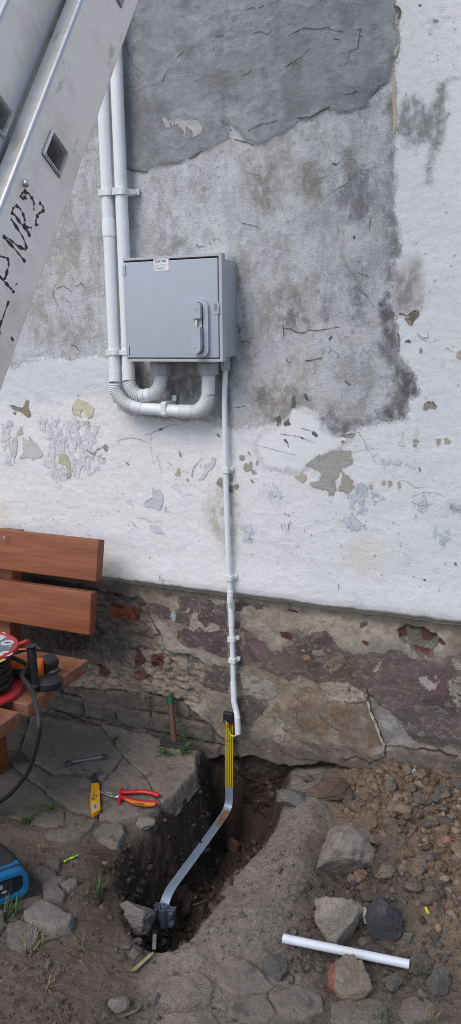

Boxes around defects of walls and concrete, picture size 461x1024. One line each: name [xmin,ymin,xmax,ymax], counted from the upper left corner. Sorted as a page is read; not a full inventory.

crack [248,5,363,54]
water stain [388,87,444,157]
flaking render [1,0,437,534]
water stain [379,277,412,420]
water stain [256,386,309,427]
peeling [56,591,461,754]
crack [344,689,458,764]